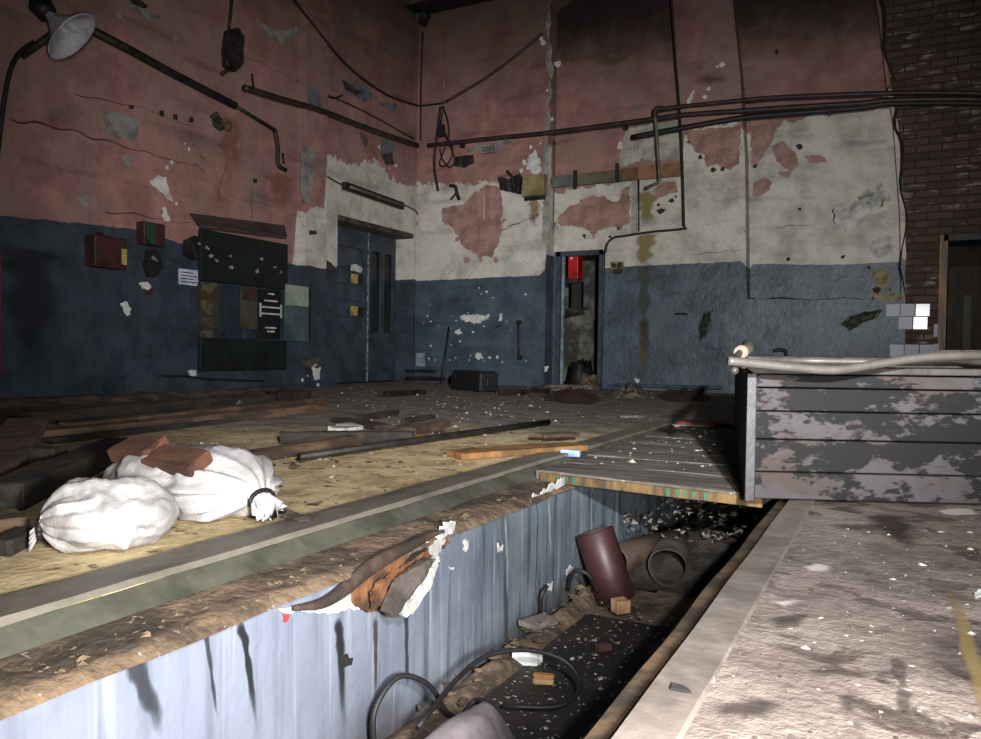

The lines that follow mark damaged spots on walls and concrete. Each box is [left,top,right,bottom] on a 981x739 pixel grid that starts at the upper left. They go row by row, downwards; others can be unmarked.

crack [74,93,202,129]
crack [11,119,229,201]
peeling [149,160,178,221]
peeling [441,185,506,263]
peeling [617,119,827,197]
peeling [416,345,432,367]
peeling [449,313,511,346]
spalling [0,477,708,739]
leakage [128,663,159,719]
leakage [205,637,216,705]
leakage [238,624,255,707]
leakage [335,621,345,702]